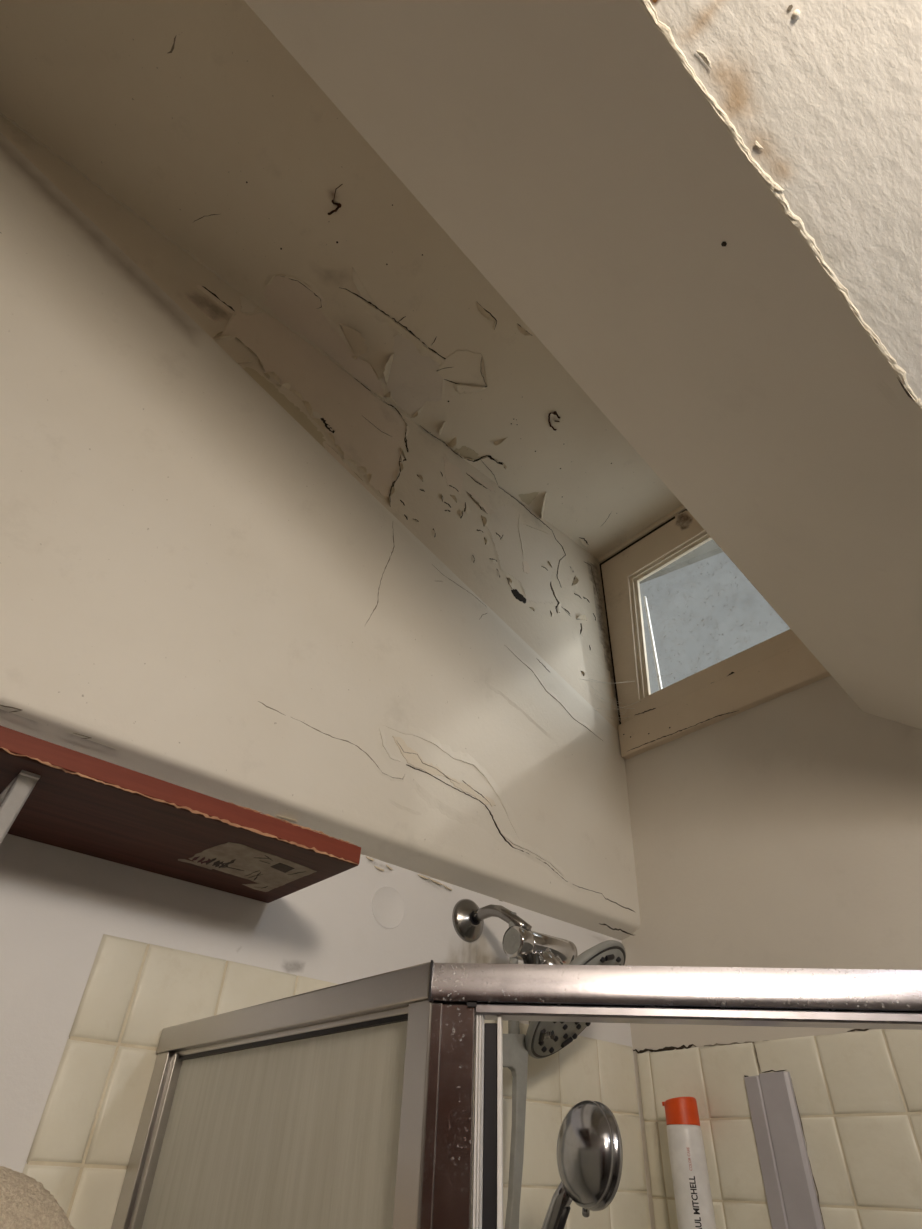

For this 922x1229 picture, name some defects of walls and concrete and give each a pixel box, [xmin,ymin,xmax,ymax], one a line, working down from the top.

crack [353,377,600,625]
spalling [508,580,526,603]
crack [485,643,736,751]
crack [258,701,633,935]